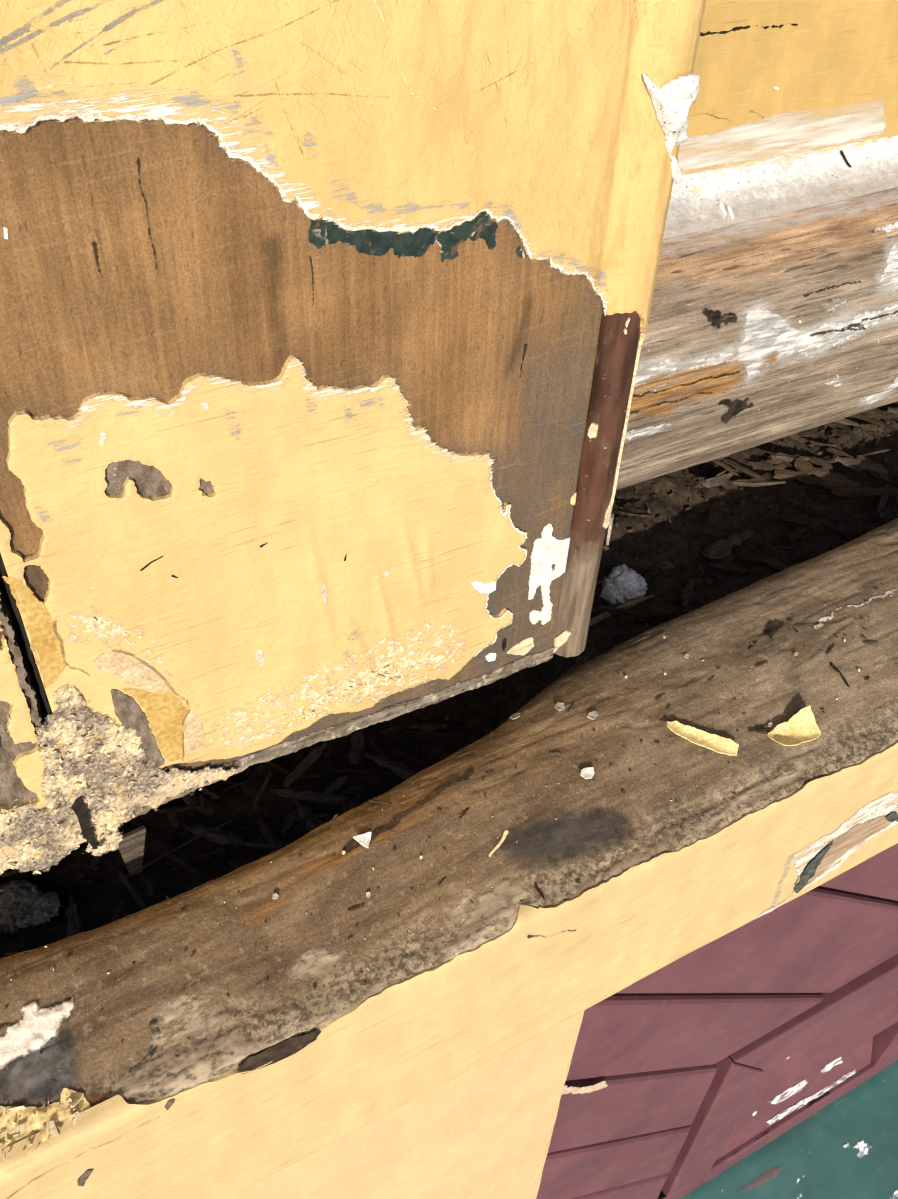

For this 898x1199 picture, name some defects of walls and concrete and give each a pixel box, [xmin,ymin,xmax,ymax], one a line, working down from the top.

peeling [0,80,608,875]